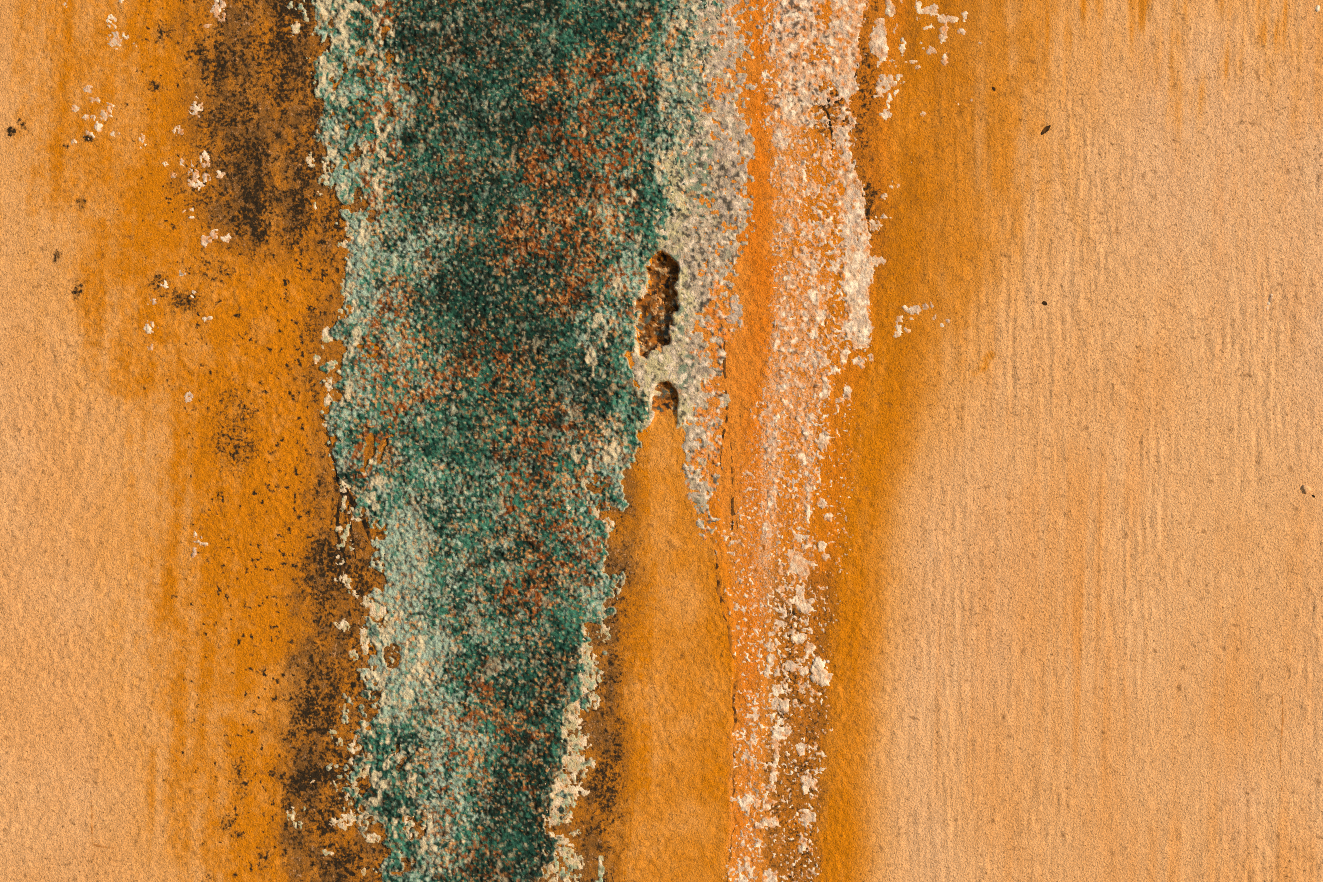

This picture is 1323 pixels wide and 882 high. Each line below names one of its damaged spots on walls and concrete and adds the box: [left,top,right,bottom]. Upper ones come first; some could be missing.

water stain [0,0,427,882]
corrosion [670,0,766,510]
peeling [631,0,968,882]
corrosion [815,0,918,582]
water stain [538,0,1323,882]